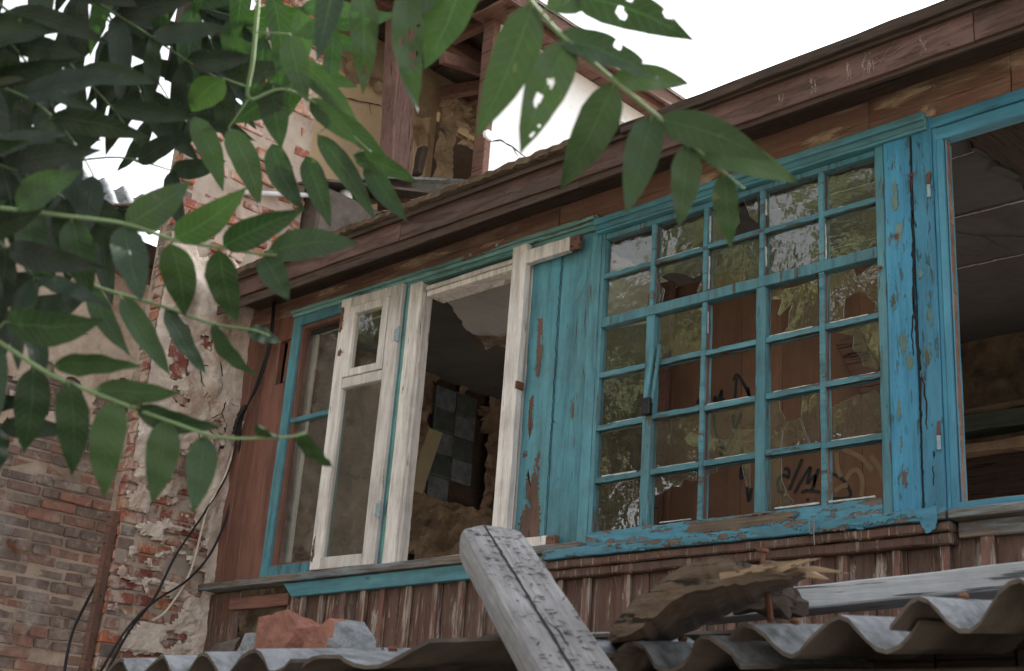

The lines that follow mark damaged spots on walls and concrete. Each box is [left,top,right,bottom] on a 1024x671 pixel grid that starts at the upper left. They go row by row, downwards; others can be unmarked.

peeling [891,180,904,241]
peeling [608,251,677,316]
flaking render [168,336,191,408]
peeling [447,283,511,350]
peeling [534,318,543,377]
peeling [899,329,931,370]
crack [909,140,935,509]
peeling [517,450,541,538]
peeling [607,506,939,550]